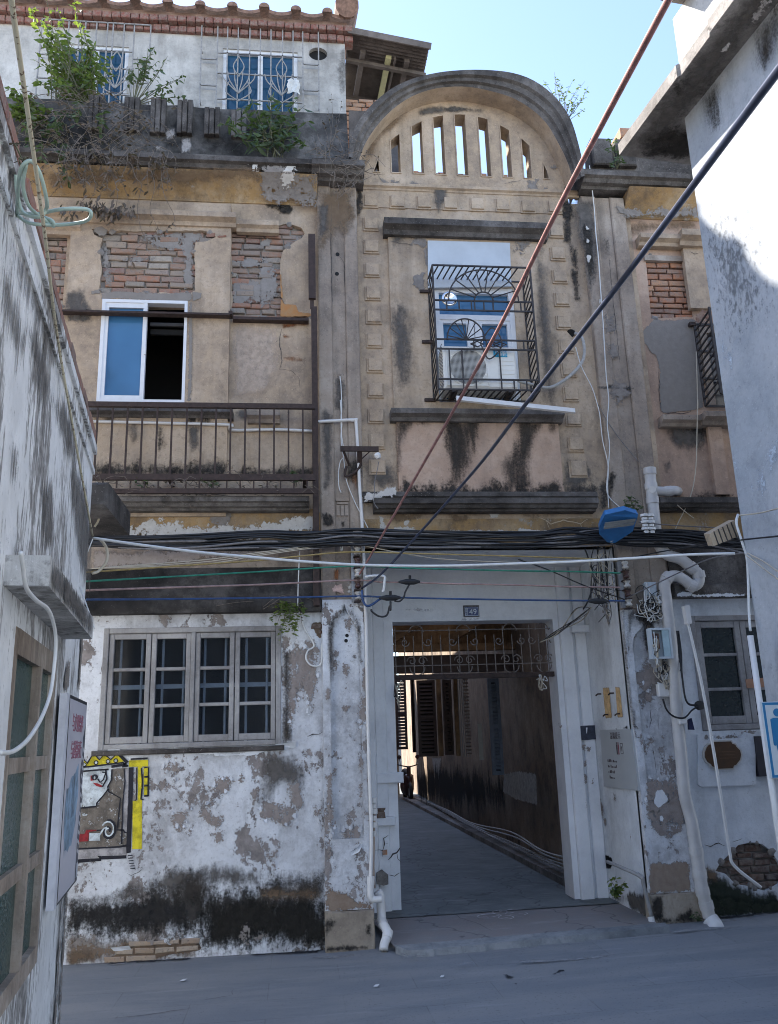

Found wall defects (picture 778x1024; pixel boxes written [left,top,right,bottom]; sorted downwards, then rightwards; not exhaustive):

peeling [248,164,321,208]
spalling [92,222,311,319]
leakage [563,188,609,300]
leakage [391,305,411,382]
leakage [1,236,225,634]
leakage [371,422,615,509]
peeling [130,515,313,540]
peeling [276,618,367,749]
peeling [168,750,363,858]
peeling [644,775,684,838]
spalling [716,841,778,891]
leakage [65,867,371,965]